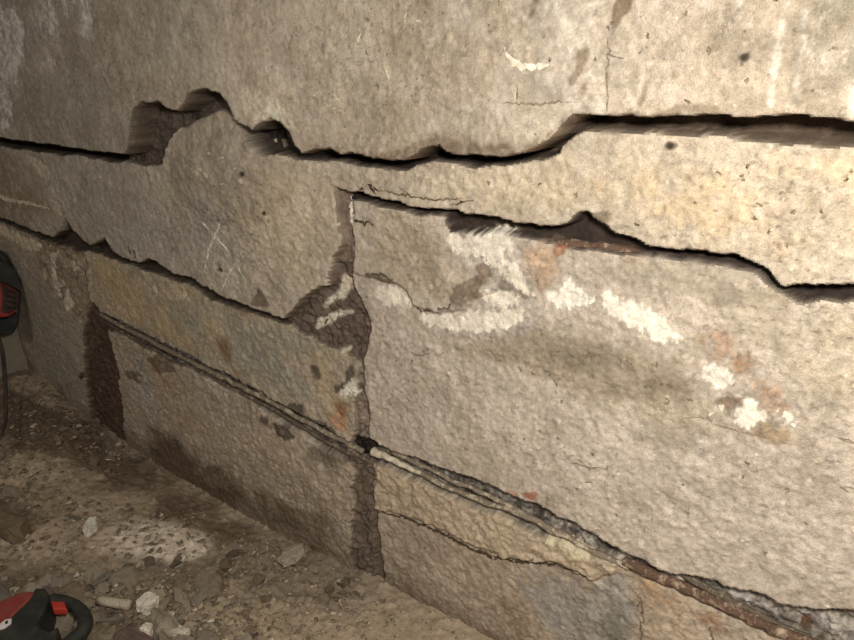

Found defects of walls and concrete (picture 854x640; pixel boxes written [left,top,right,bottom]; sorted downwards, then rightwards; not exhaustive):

crack [0,137,130,164]
spalling [119,88,325,167]
crack [289,21,854,306]
crack [0,218,290,326]
crack [412,303,451,313]
water stain [433,295,546,339]
water stain [454,240,531,291]
water stain [700,358,799,443]
crack [113,317,854,640]